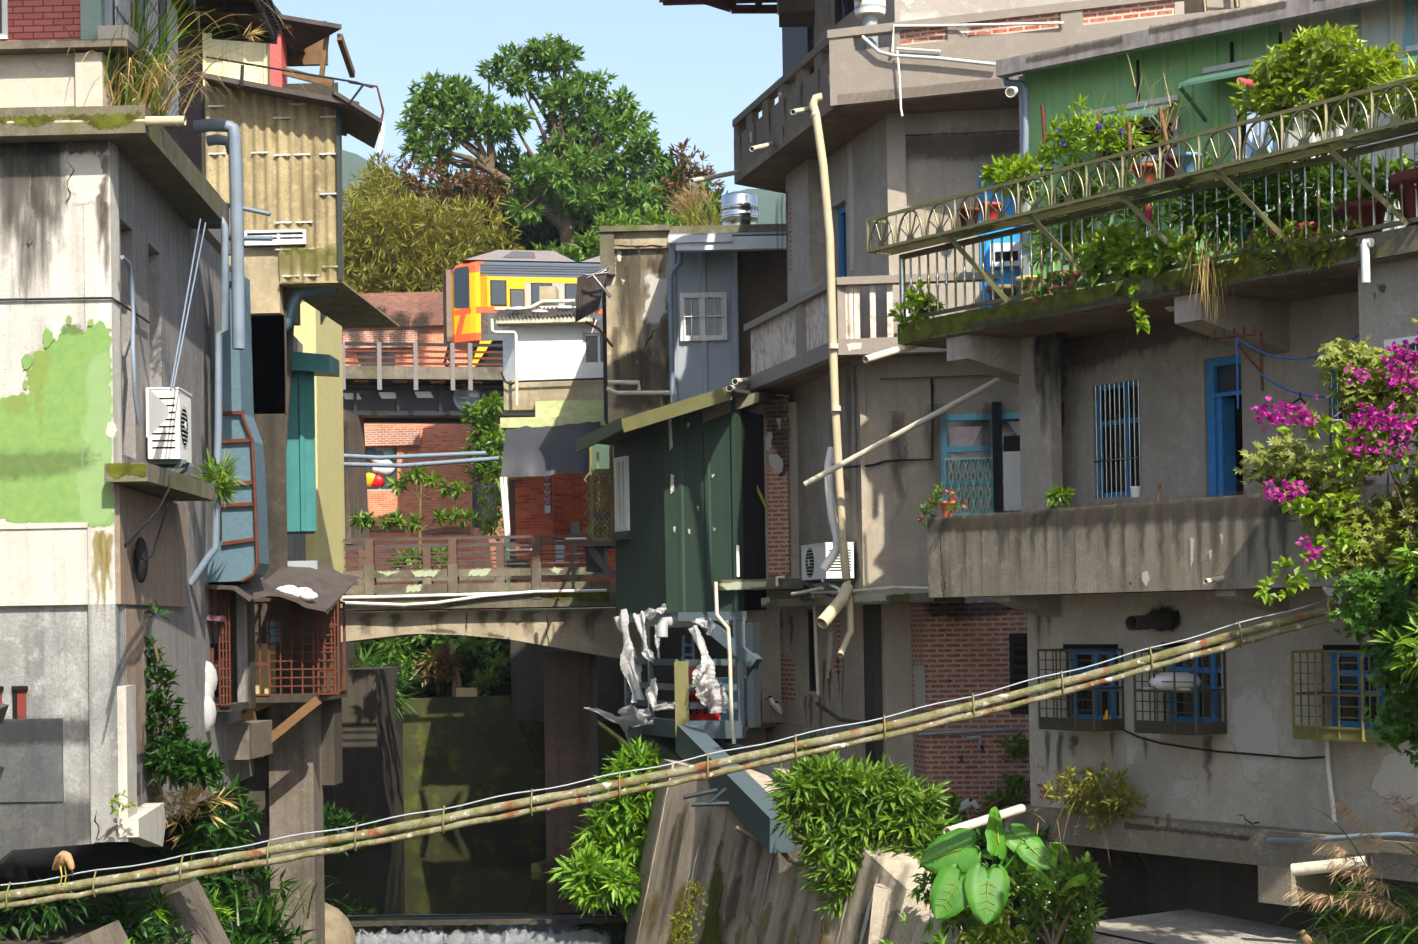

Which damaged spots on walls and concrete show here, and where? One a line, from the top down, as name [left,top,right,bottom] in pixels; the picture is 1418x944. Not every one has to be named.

damp [0,141,109,270]
damp [963,288,1210,433]
damp [93,531,112,602]
damp [641,837,699,944]
damp [818,897,848,944]